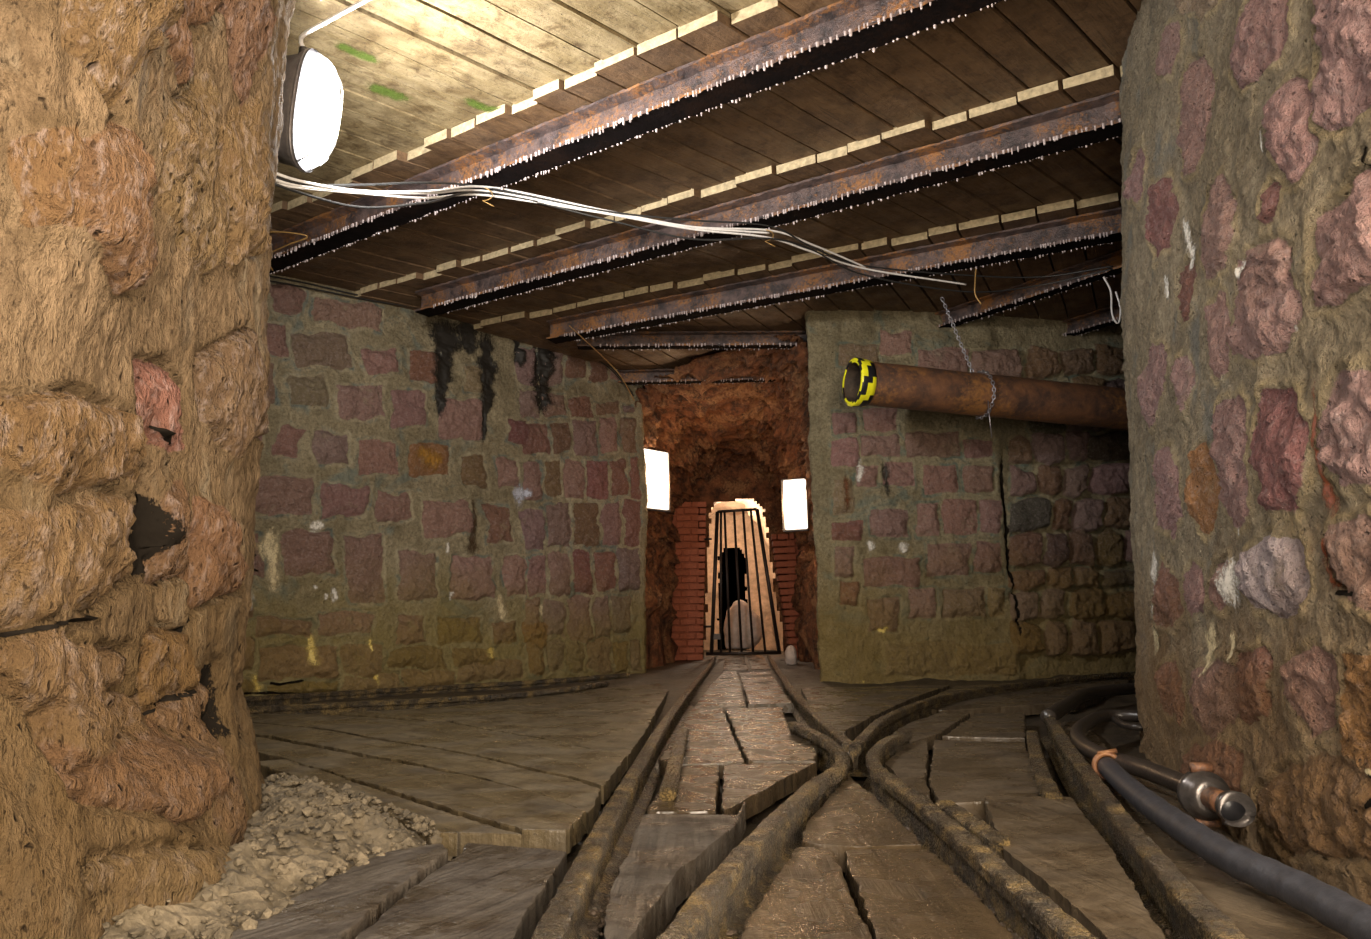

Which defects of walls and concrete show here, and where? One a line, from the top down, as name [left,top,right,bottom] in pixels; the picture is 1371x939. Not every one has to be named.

leakage [424,318,558,443]